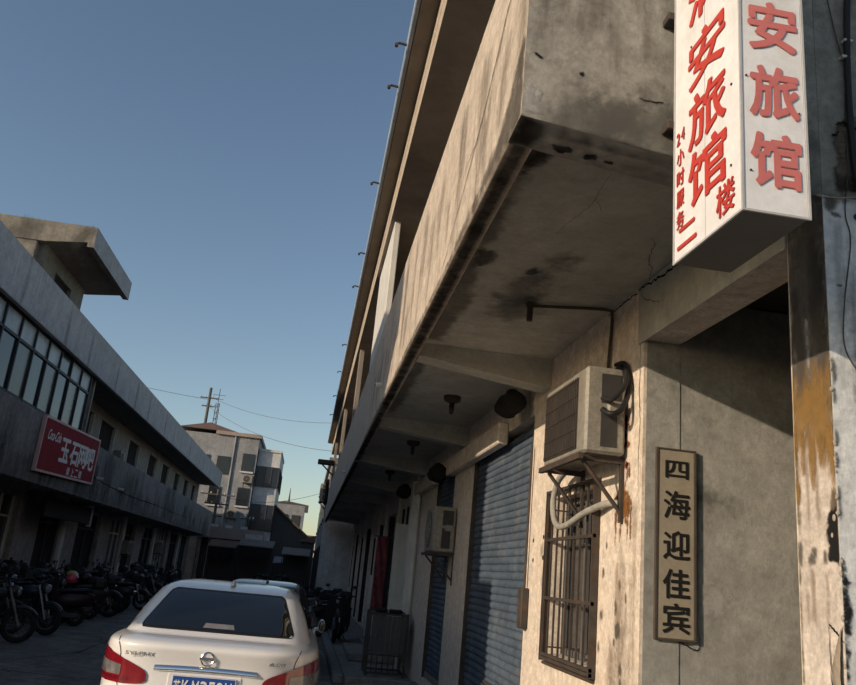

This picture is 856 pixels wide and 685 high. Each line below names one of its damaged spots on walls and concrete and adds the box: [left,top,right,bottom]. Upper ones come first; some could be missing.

spalling [825,117,856,217]
leakage [326,39,673,521]
crack [608,243,677,316]
rust [792,363,835,489]
rust [614,484,632,539]
spalling [799,487,853,682]